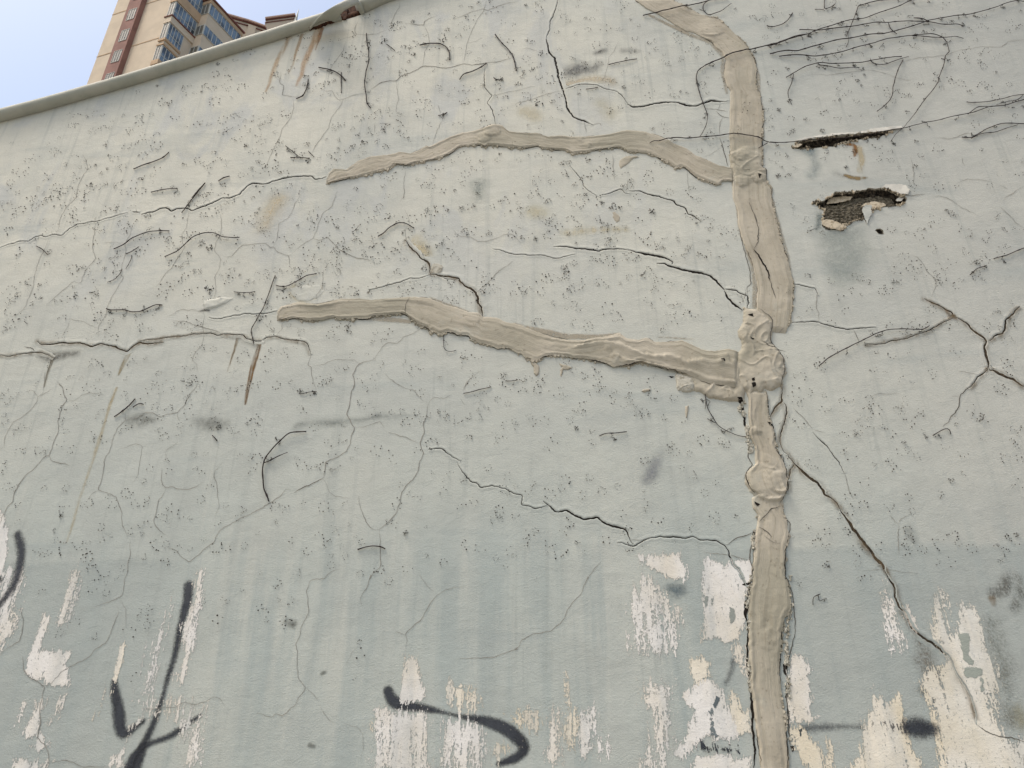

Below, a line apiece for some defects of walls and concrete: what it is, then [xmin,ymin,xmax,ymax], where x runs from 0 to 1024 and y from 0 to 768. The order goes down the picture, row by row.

crack [568,164,702,223]
spalling [791,126,902,151]
spalling [811,184,910,234]
crack [0,321,314,378]
rust [245,344,261,404]
crack [864,297,1024,424]
crack [796,411,847,474]
crack [0,375,198,768]
peeling [12,562,85,768]
peeling [363,652,523,768]
peeling [624,550,757,768]
peeling [786,578,1024,768]